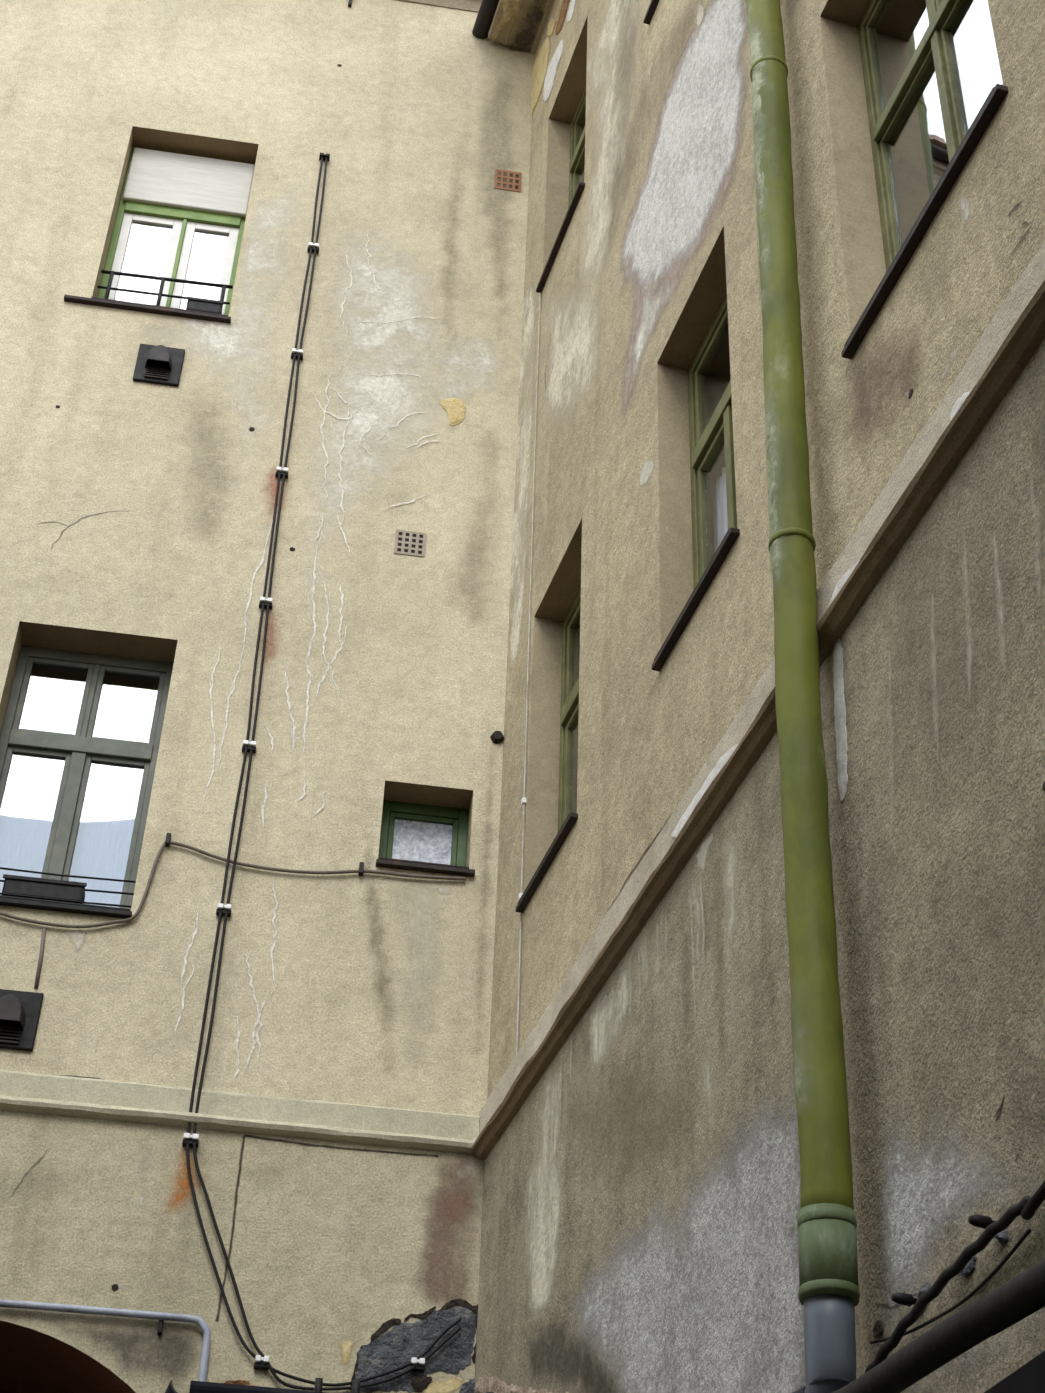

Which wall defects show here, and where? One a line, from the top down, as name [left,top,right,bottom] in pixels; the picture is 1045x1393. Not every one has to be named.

flaking render [531,0,576,117]
flaking render [619,0,747,411]
peeling [440,398,466,426]
crack [42,510,133,547]
water stain [692,833,737,976]
water stain [590,951,645,1067]
crack [9,1148,50,1198]
water stain [421,1158,474,1301]
water stain [527,1075,561,1315]
water stain [530,1107,805,1393]
spalling [340,1299,478,1393]